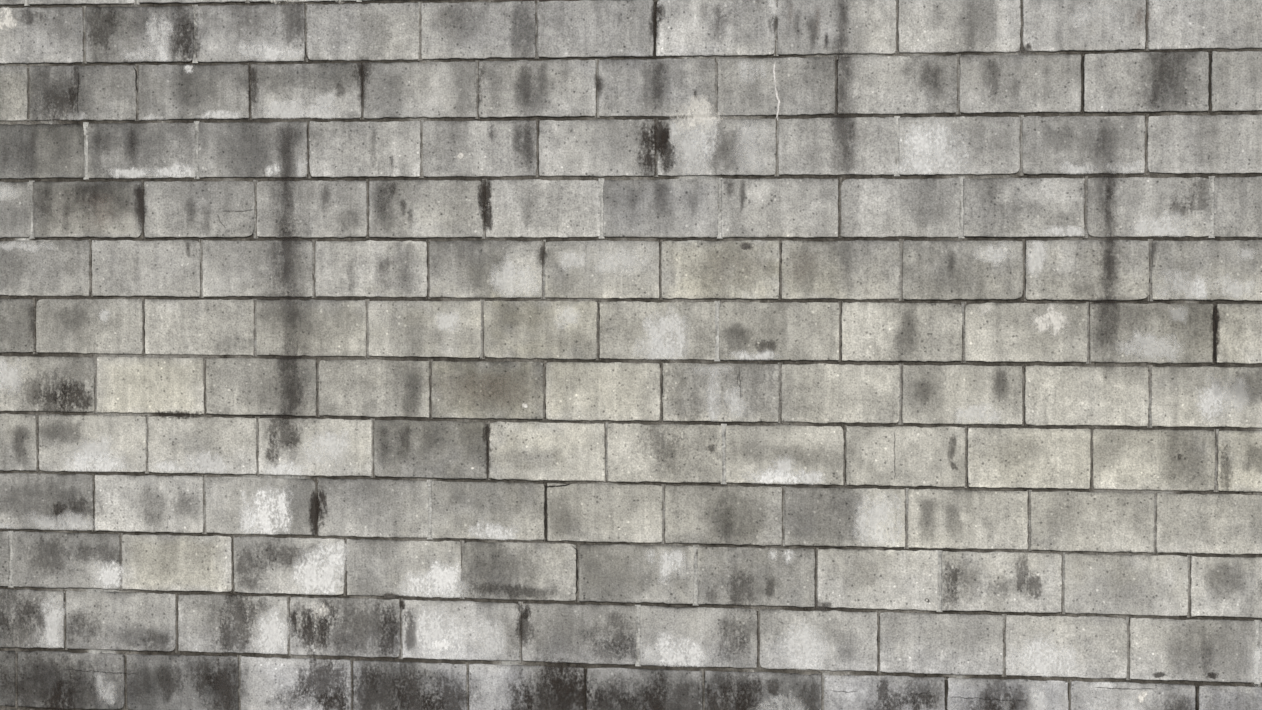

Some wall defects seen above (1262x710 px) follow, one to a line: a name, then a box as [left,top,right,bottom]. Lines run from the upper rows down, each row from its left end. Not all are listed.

damp [638,91,720,175]
damp [478,182,492,229]
damp [55,384,90,412]
damp [43,600,62,645]
damp [400,561,464,659]
damp [645,633,704,667]
damp [1023,640,1074,676]
damp [395,665,467,710]
damp [525,663,589,710]
damp [707,680,778,710]